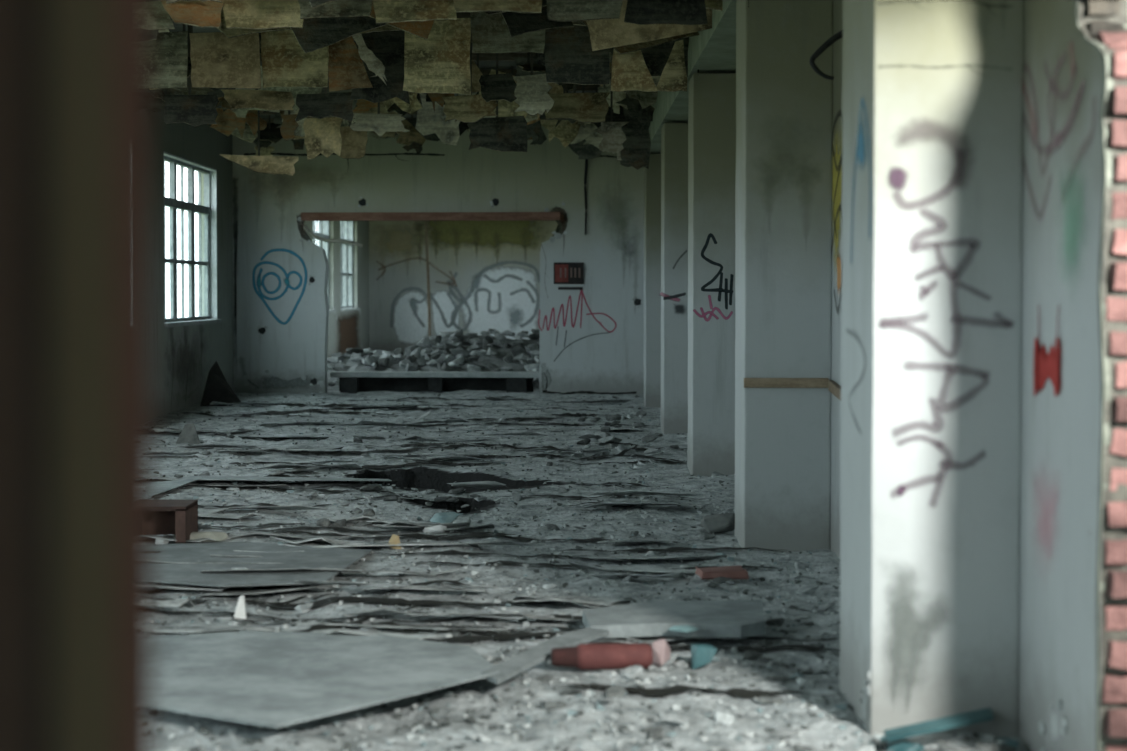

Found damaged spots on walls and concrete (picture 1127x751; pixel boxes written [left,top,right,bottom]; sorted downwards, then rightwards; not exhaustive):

damp [386,221,539,252]
spalling [1074,0,1127,751]
damp [890,602,925,682]